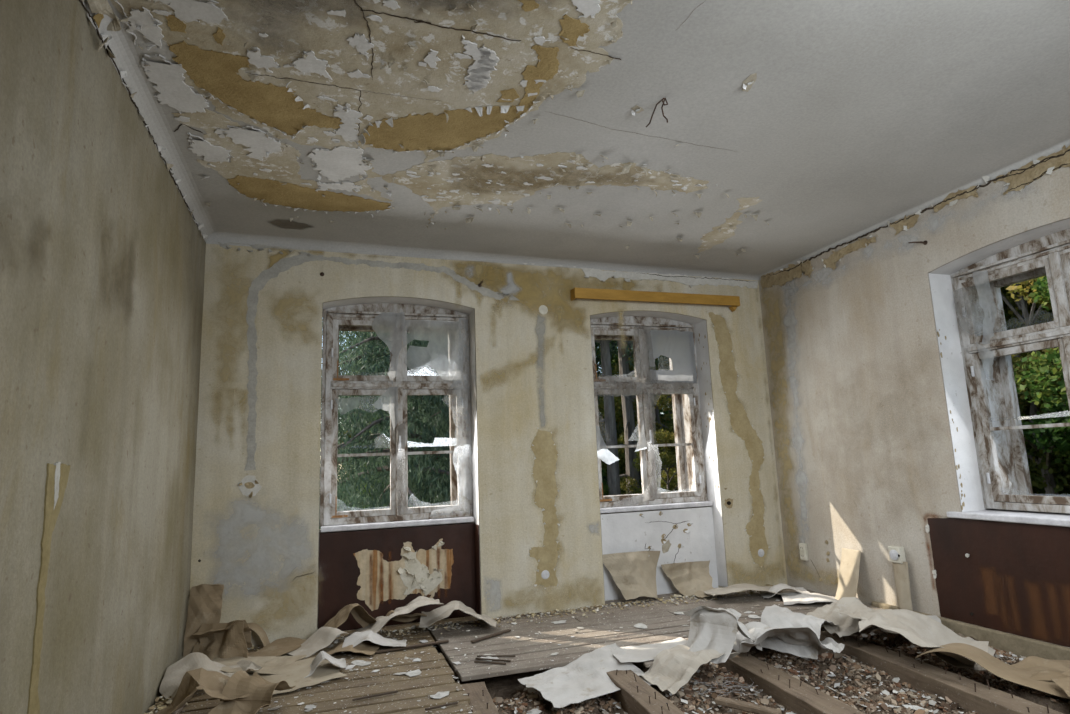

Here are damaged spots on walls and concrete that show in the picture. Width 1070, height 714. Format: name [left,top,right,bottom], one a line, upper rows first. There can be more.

crack [246,0,521,136]
peeling [82,0,769,260]
spalling [887,145,1070,236]
peeling [558,235,876,292]
peeling [354,539,454,611]
peeling [529,427,561,589]
peeling [698,312,771,568]